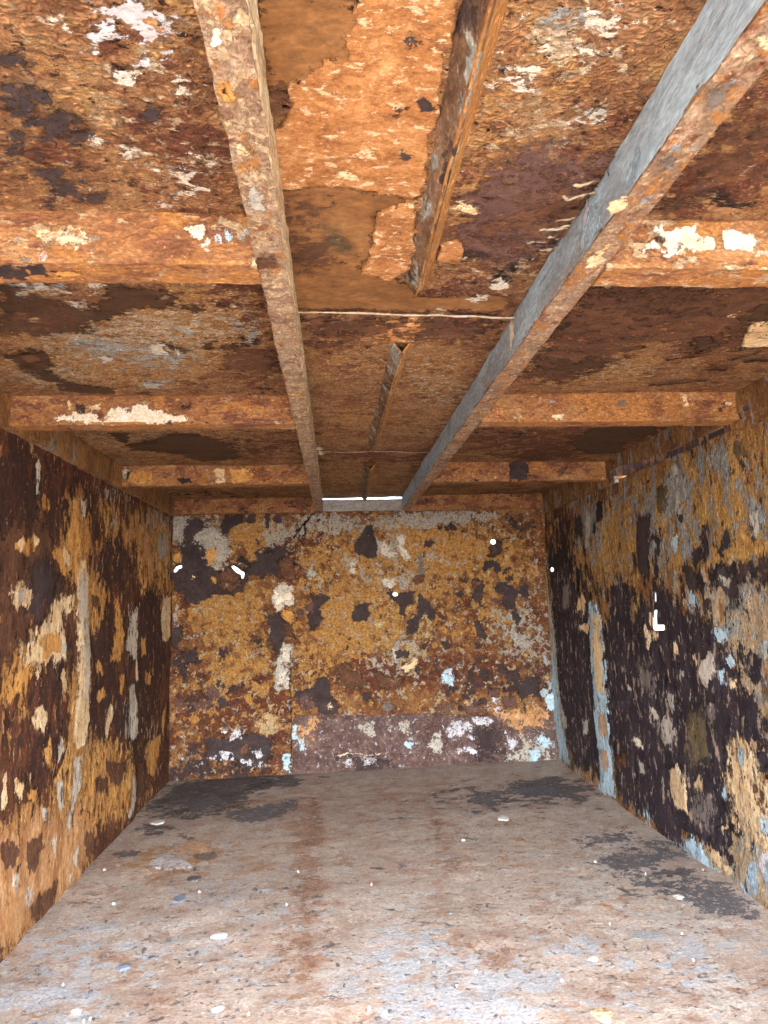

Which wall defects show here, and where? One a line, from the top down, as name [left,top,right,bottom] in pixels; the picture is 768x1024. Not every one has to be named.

peeling [87,21,129,55]
peeling [258,0,356,129]
rust [437,138,615,264]
rust [605,196,628,216]
peeling [722,230,768,259]
peeling [0,283,206,415]
rust [741,322,768,348]
rust [0,496,173,959]
leakage [155,728,292,821]
leakage [571,827,676,857]
leakage [663,867,741,897]
rust [722,732,768,865]